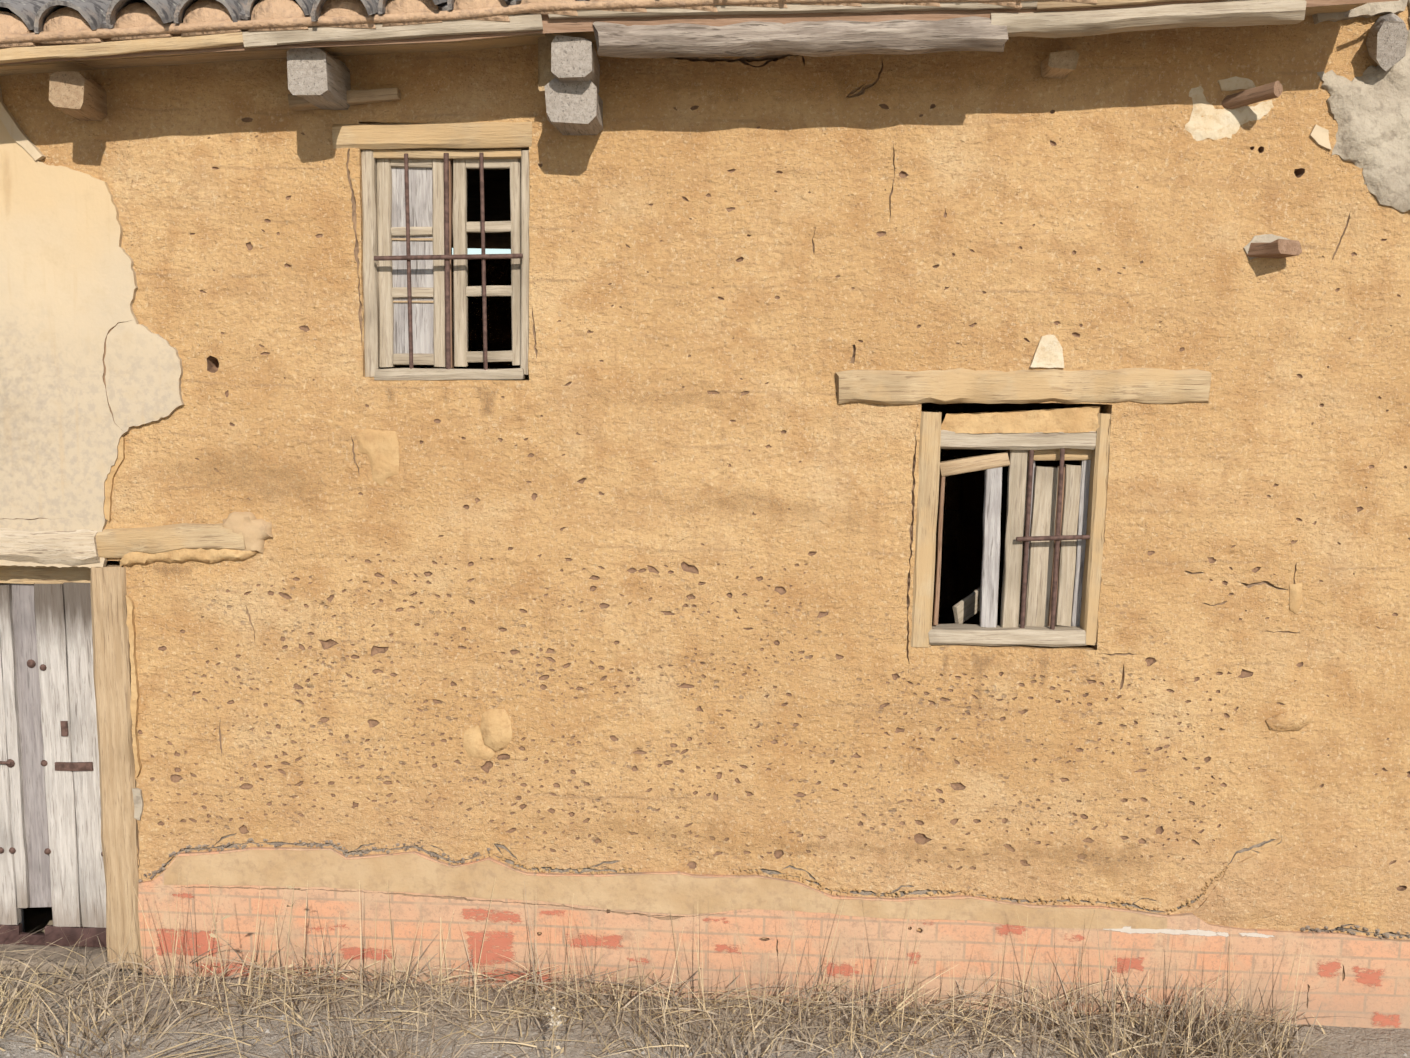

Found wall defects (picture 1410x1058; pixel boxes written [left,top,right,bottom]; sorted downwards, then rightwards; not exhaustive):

peeling [1312,0,1408,24]
peeling [1218,76,1255,91]
peeling [1309,124,1332,150]
peeling [0,86,184,532]
peeling [0,557,107,568]
flaking render [126,594,143,778]
crack [137,830,750,920]
crack [729,836,1282,915]
spalling [156,928,249,977]
spalling [462,909,551,985]
spalling [567,934,649,963]
spalling [1318,962,1382,986]